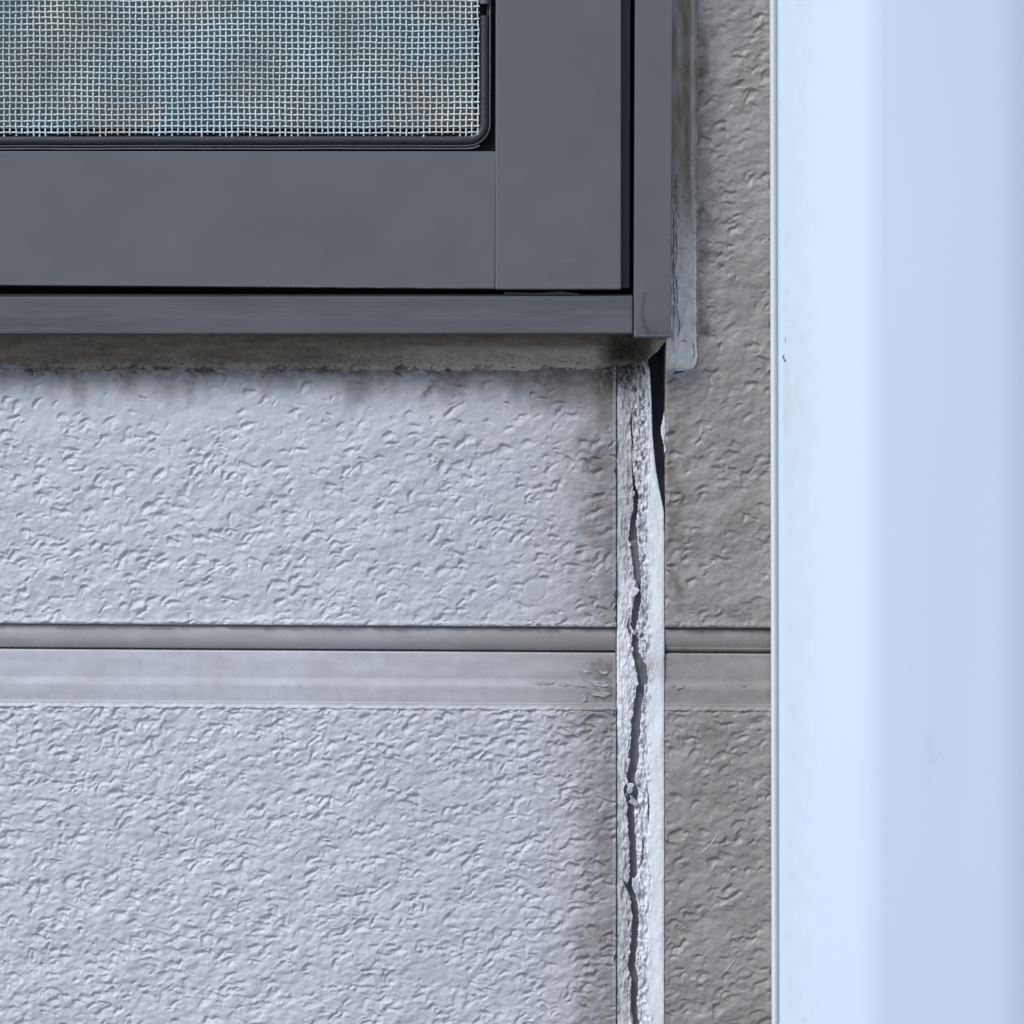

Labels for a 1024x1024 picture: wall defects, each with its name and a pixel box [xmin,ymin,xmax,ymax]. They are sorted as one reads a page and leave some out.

water stain [515,341,642,381]
crack [613,175,695,1024]
peeling [534,670,613,704]